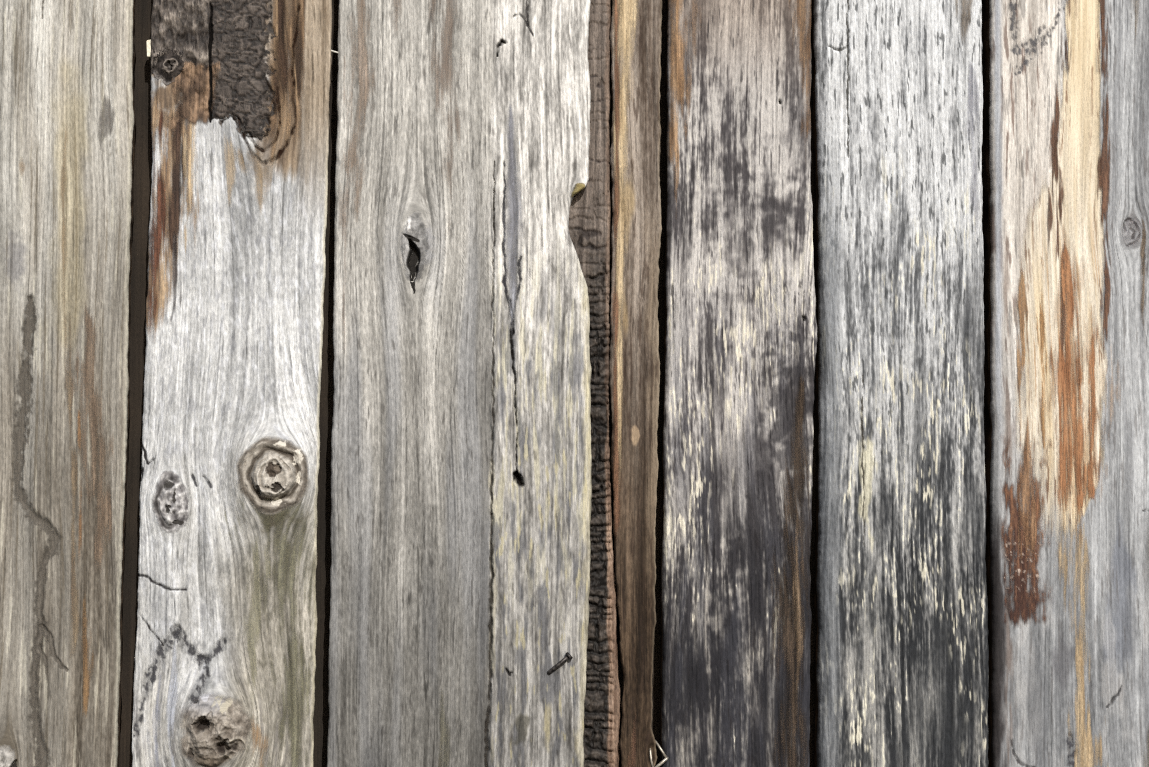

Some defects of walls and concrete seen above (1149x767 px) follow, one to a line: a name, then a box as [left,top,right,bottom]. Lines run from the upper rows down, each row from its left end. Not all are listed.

crack [13,295,68,767]
crack [484,161,524,767]